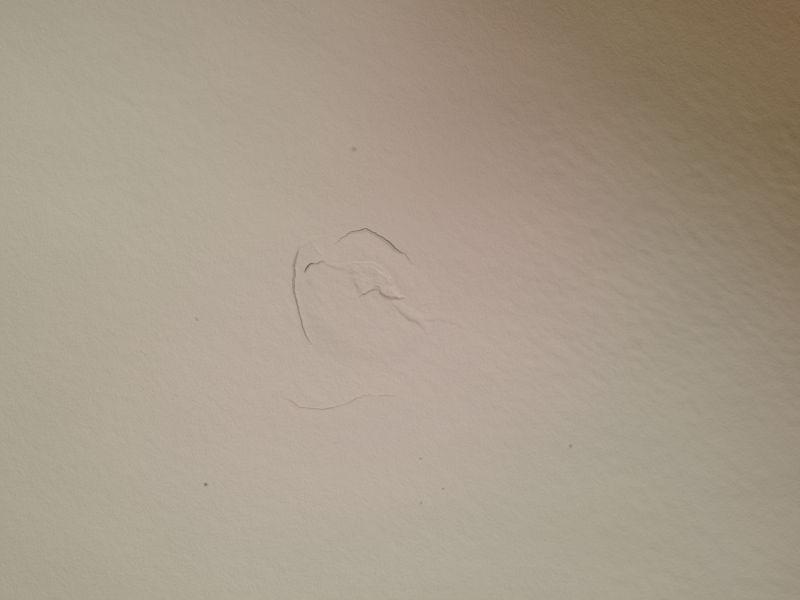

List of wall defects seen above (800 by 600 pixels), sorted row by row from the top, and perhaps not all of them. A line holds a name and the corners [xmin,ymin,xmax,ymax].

crack [289,226,415,345]